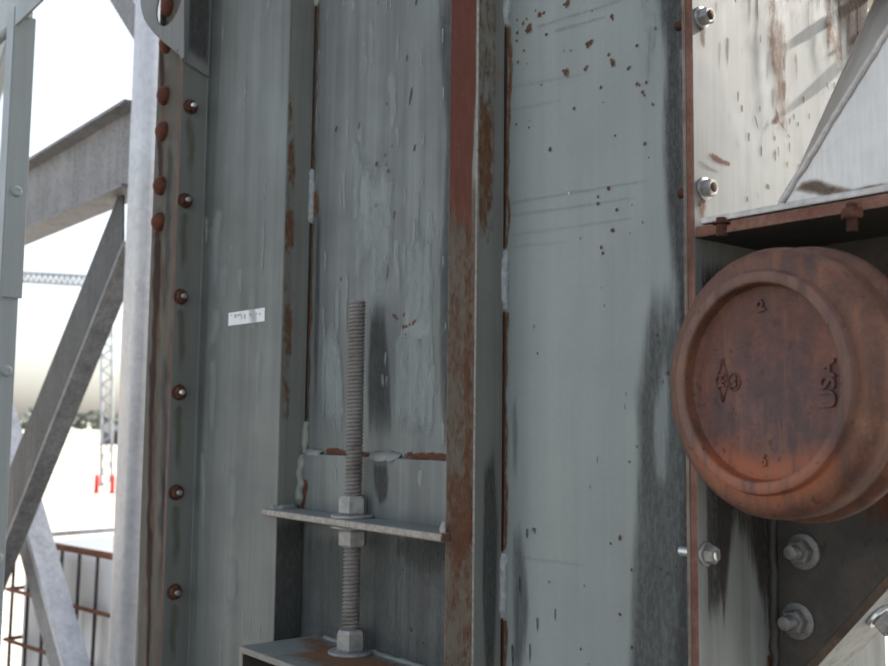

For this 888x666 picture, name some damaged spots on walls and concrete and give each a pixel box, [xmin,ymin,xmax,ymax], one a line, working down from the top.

rust [827,18,842,58]
leakage [839,0,868,54]
rust [760,0,799,168]
rust [447,0,545,619]
leakage [634,0,688,666]
rust [146,231,161,666]
rust [405,452,447,461]
rust [293,638,396,666]
rust [500,619,508,666]